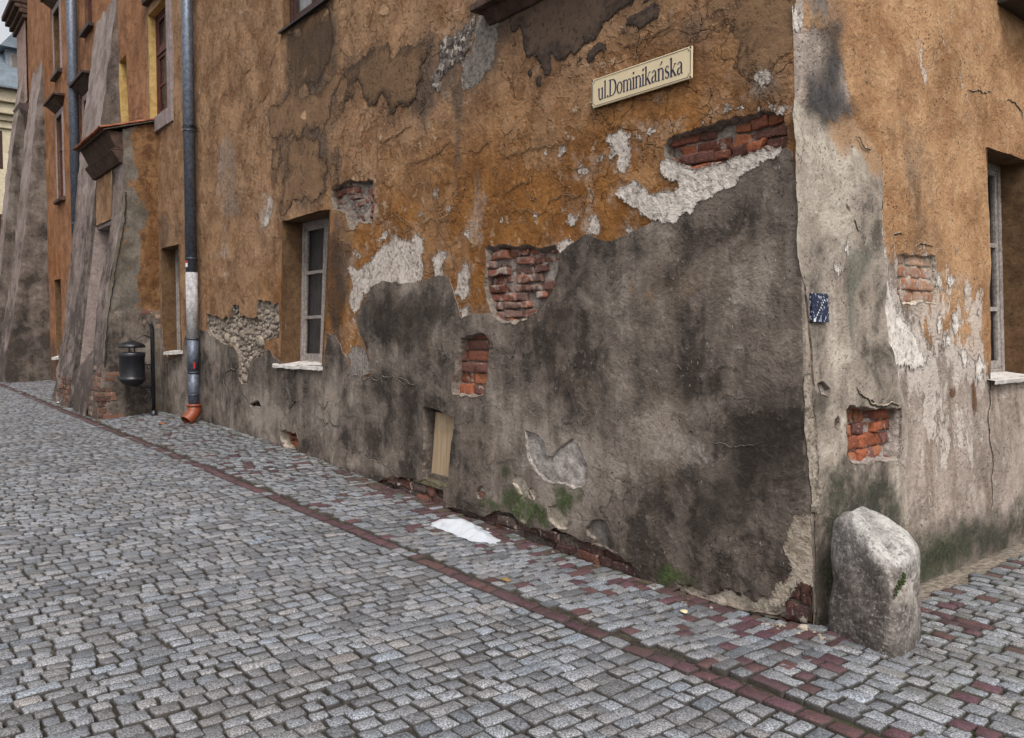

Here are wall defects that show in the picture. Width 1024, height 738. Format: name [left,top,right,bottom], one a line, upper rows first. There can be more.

peeling [263,4,475,230]
crack [412,142,599,215]
flaking render [577,96,795,224]
flaking render [207,299,280,385]
flaking render [451,332,491,398]
flaking render [454,212,601,325]
flaking render [882,232,985,381]
flaking render [834,404,902,465]
flaking render [380,430,640,578]